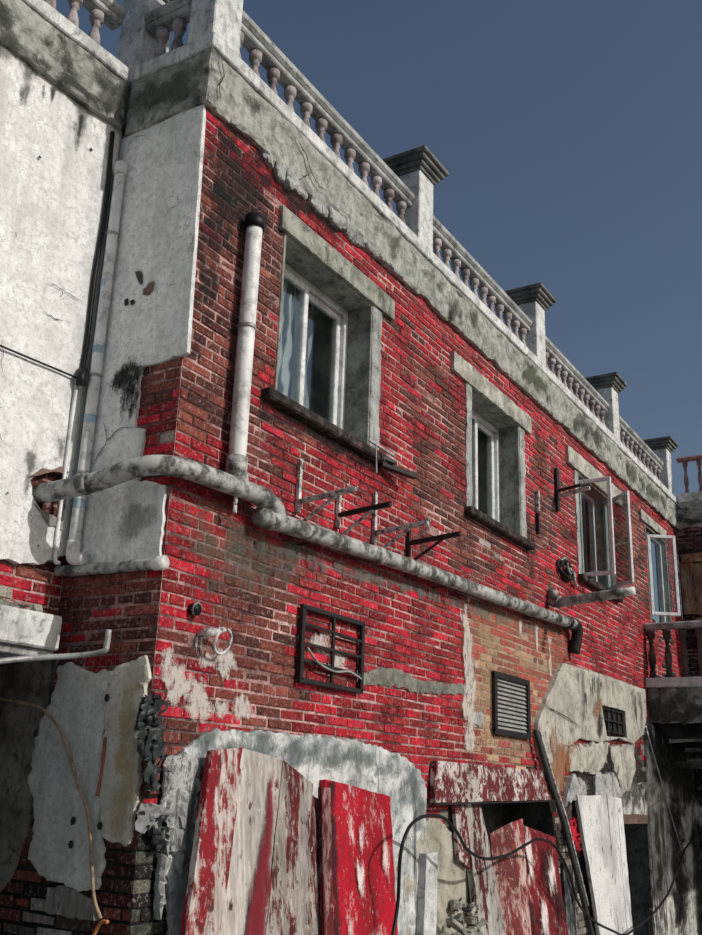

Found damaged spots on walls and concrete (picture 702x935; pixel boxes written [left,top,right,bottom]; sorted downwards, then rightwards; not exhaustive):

damp [0,28,51,102]
damp [74,94,111,144]
damp [110,355,145,418]
flaking render [0,598,43,613]
damp [578,673,603,737]
peeling [27,655,152,921]
damp [632,688,702,935]